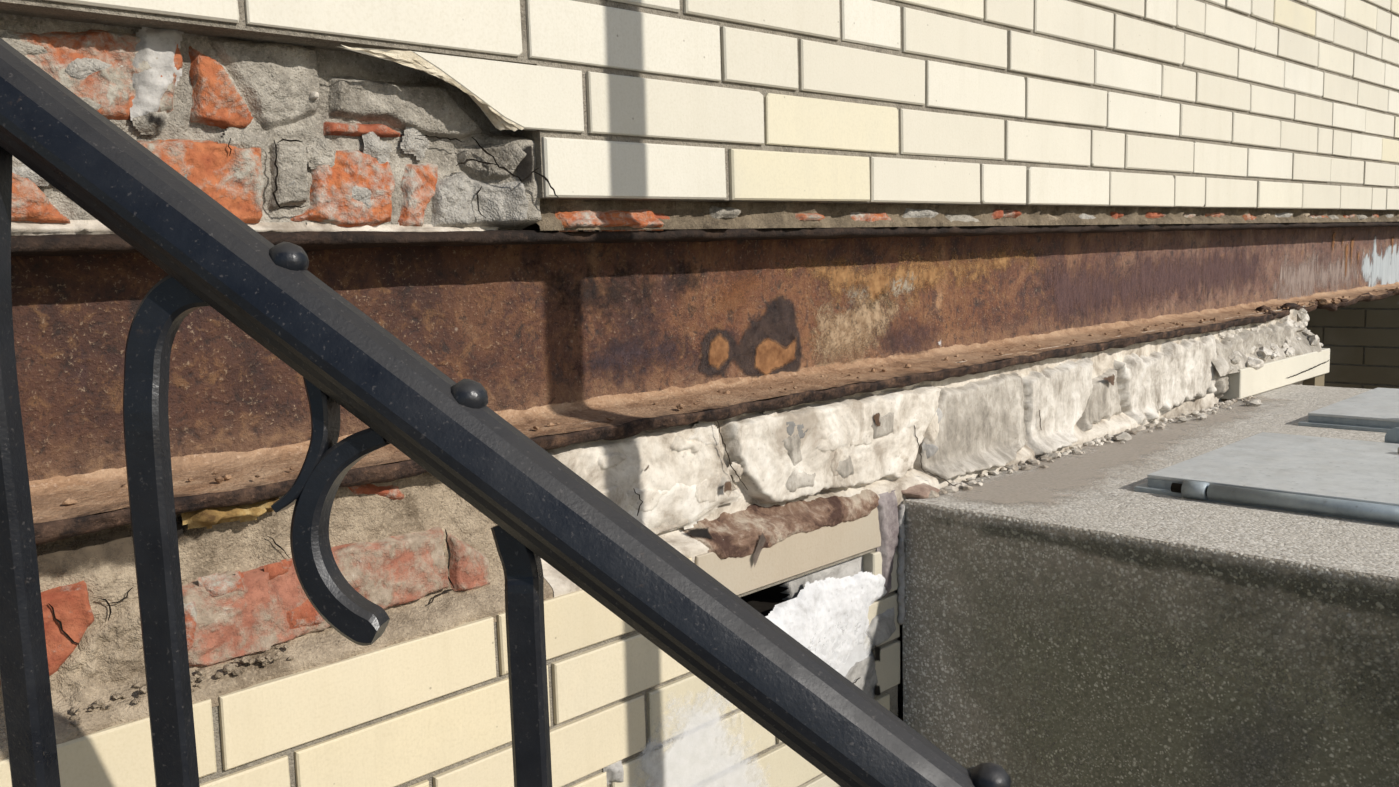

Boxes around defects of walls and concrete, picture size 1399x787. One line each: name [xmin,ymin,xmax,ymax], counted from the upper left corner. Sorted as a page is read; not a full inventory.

spalling [0,13,584,236]
rust [699,249,1037,377]
rust [1256,254,1384,316]
peeling [1332,232,1399,287]
spalling [0,681,9,760]
spalling [36,507,149,745]
spalling [176,459,505,707]
flaking render [534,306,1323,699]